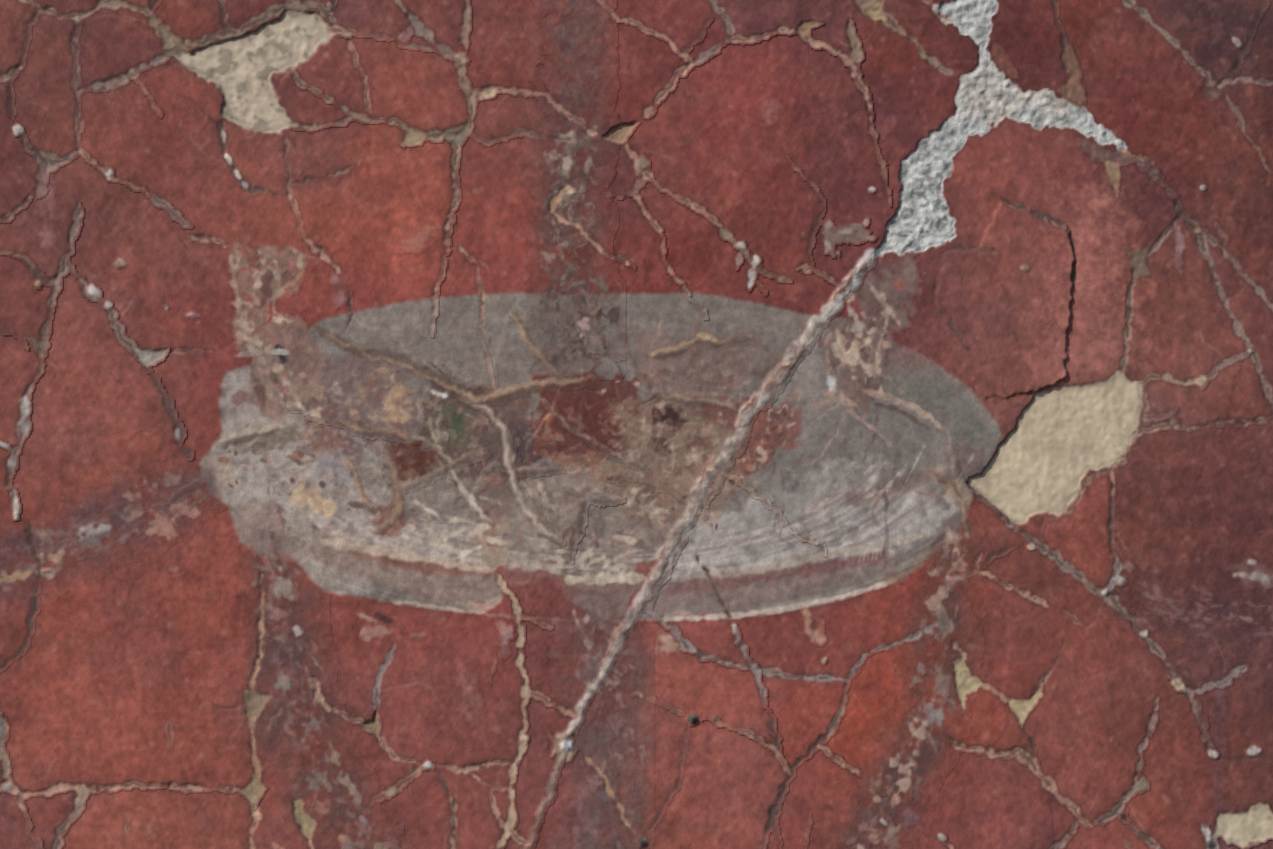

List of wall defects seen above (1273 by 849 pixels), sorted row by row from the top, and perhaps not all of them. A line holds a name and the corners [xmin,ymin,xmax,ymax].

flaking render [172,0,338,135]
crack [1050,0,1088,110]
crack [1120,0,1273,175]
crack [0,0,233,673]
crack [216,0,957,849]
crack [931,241,1000,357]
crack [990,191,1080,288]
peeling [968,161,1164,584]
crack [1118,157,1273,439]
crack [0,571,318,849]
crack [938,468,1273,849]
flaking render [1212,801,1273,849]